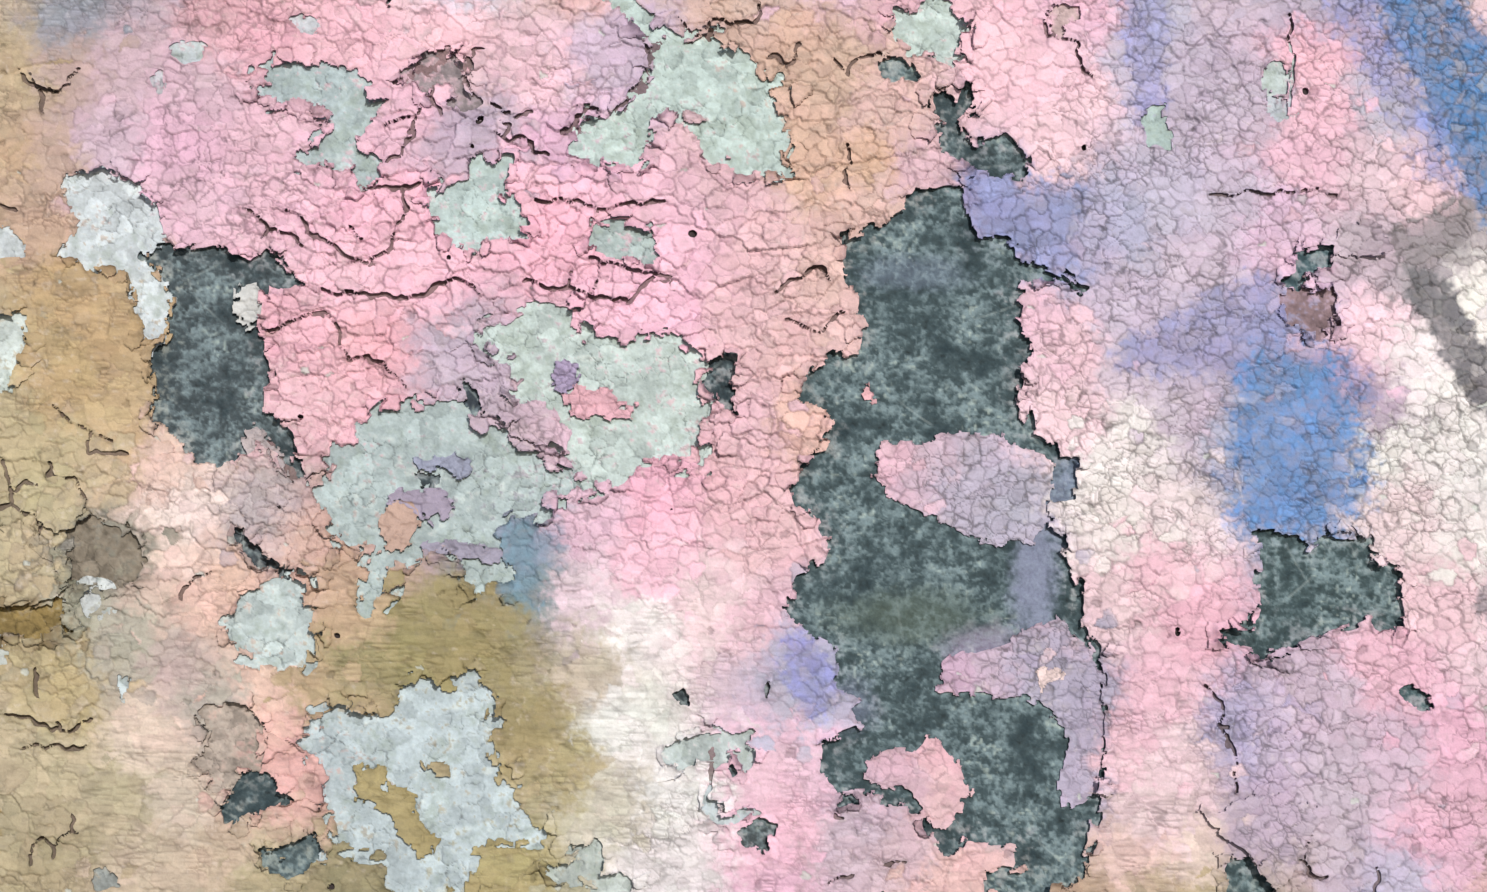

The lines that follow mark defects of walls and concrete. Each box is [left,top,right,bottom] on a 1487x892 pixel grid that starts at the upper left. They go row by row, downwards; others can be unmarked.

crack [1043,20,1093,77]
crack [247,4,892,389]
crack [1209,187,1337,198]
peeling [0,0,813,676]
crack [0,405,129,535]
peeling [776,0,1131,892]
peeling [1205,518,1422,675]
crack [5,667,93,751]
peeling [187,649,651,892]
peeling [655,688,778,855]
crack [1204,684,1238,793]
peeling [92,866,120,892]